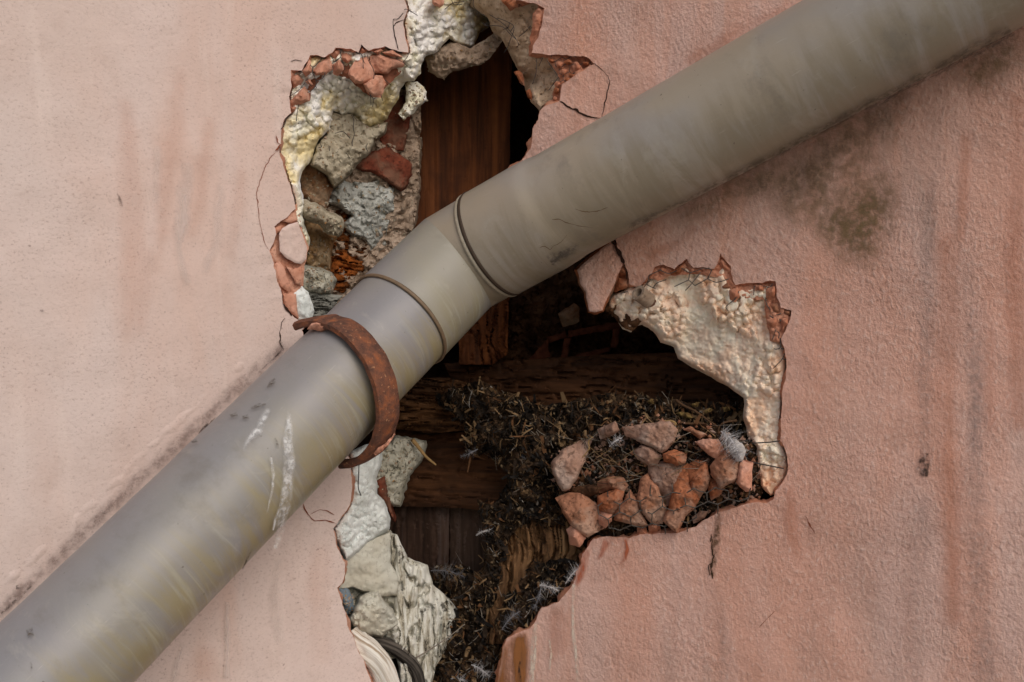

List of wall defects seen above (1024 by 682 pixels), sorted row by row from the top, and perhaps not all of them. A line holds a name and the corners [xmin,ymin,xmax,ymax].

flaking render [530,7,542,43]
flaking render [284,46,414,122]
spalling [510,60,539,165]
flaking render [547,55,591,101]
crack [560,63,610,118]
crack [256,136,282,250]
flaking render [270,204,310,335]
flaking render [650,258,791,342]
spalling [422,341,459,378]
spalling [348,430,373,456]
crack [708,534,717,579]